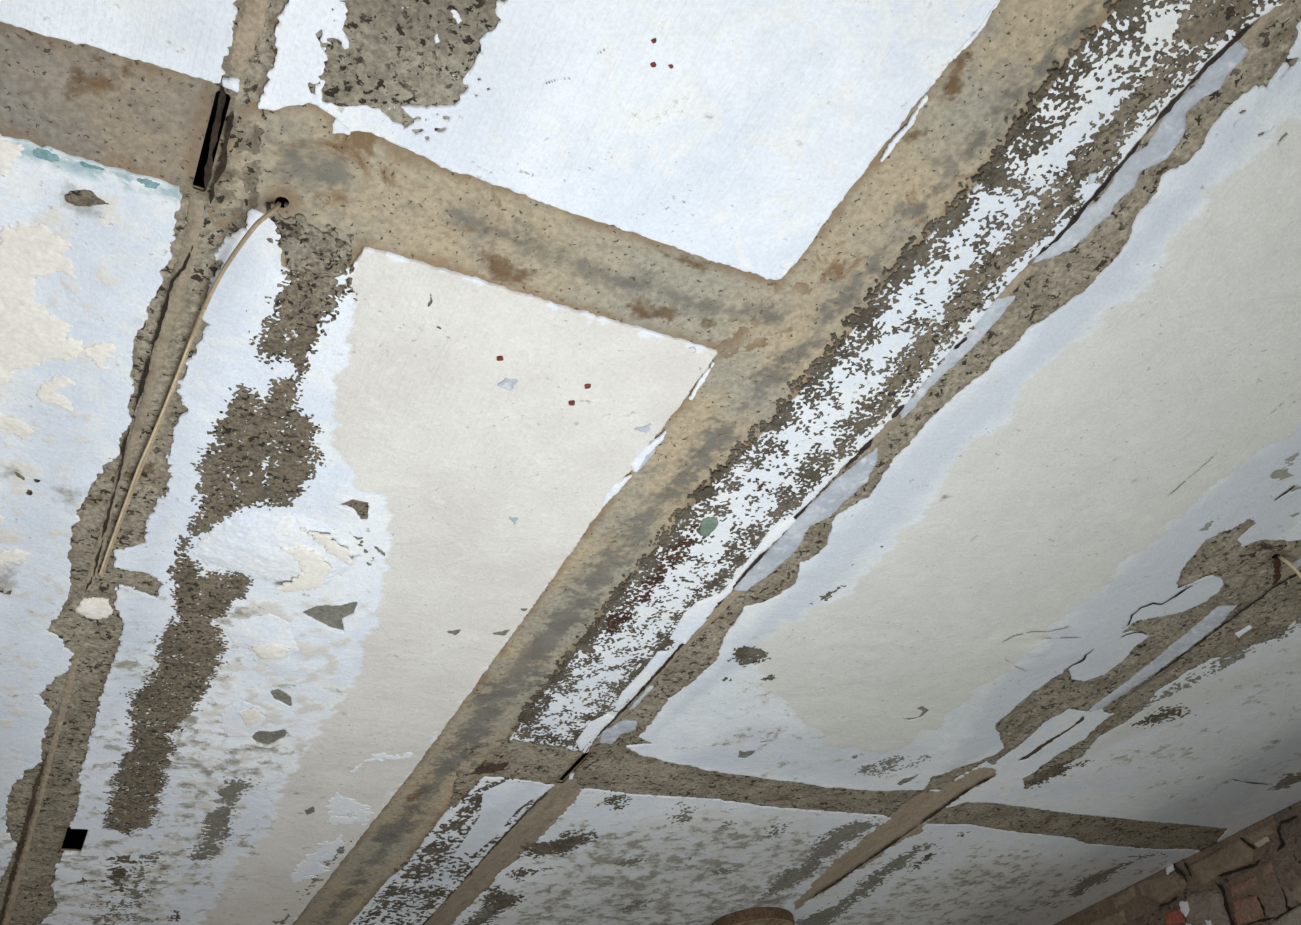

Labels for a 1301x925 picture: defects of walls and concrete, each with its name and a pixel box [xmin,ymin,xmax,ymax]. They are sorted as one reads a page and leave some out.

peeling [0,0,813,925]
peeling [290,0,1301,925]
damp [272,840,352,925]
damp [353,778,535,925]
damp [461,829,599,925]
damp [594,790,633,811]
damp [613,857,647,870]
damp [664,801,706,826]
damp [757,816,882,904]
damp [794,832,969,925]
damp [1024,760,1095,789]
crack [1158,816,1301,925]